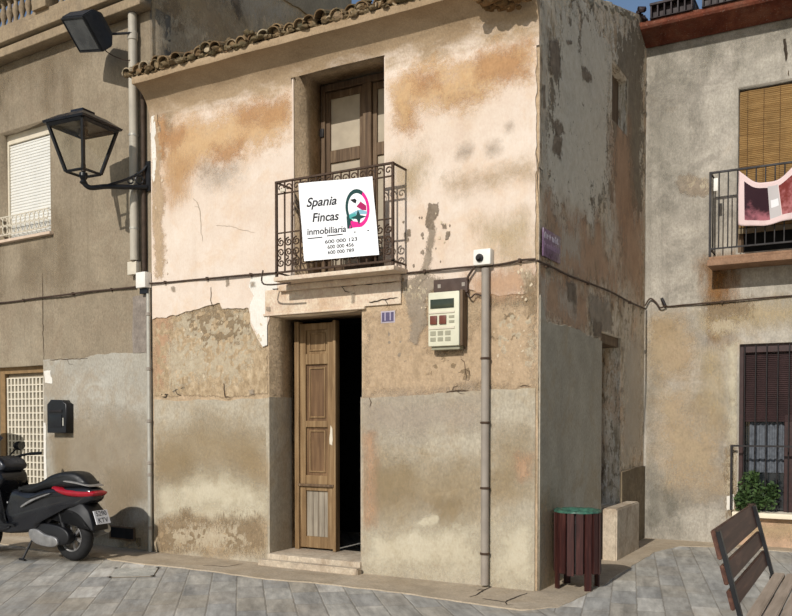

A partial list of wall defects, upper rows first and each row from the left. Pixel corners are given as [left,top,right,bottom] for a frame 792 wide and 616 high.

water stain [391,45,532,127]
water stain [164,100,292,202]
peeling [542,0,648,281]
crack [341,281,397,305]
spalling [364,203,614,398]
spalling [154,303,268,400]
crack [446,359,470,394]
water stain [158,470,268,524]